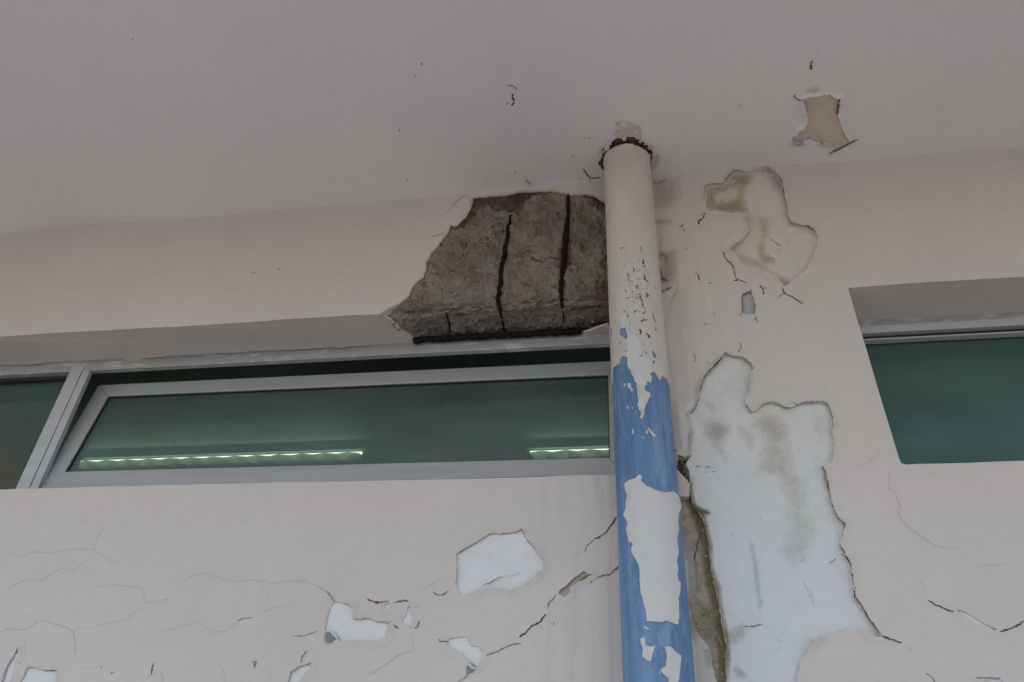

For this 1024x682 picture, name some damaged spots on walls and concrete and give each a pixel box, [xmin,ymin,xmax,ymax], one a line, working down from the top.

peeling [787,90,858,154]
rust [459,192,540,226]
spalling [380,179,658,364]
peeling [699,166,823,290]
crack [0,530,332,674]
peeling [319,591,419,648]
crack [367,578,448,673]
peeling [438,630,490,682]
peeling [450,524,551,602]
crack [486,517,619,656]
water stain [687,491,729,682]
peeling [675,348,912,682]